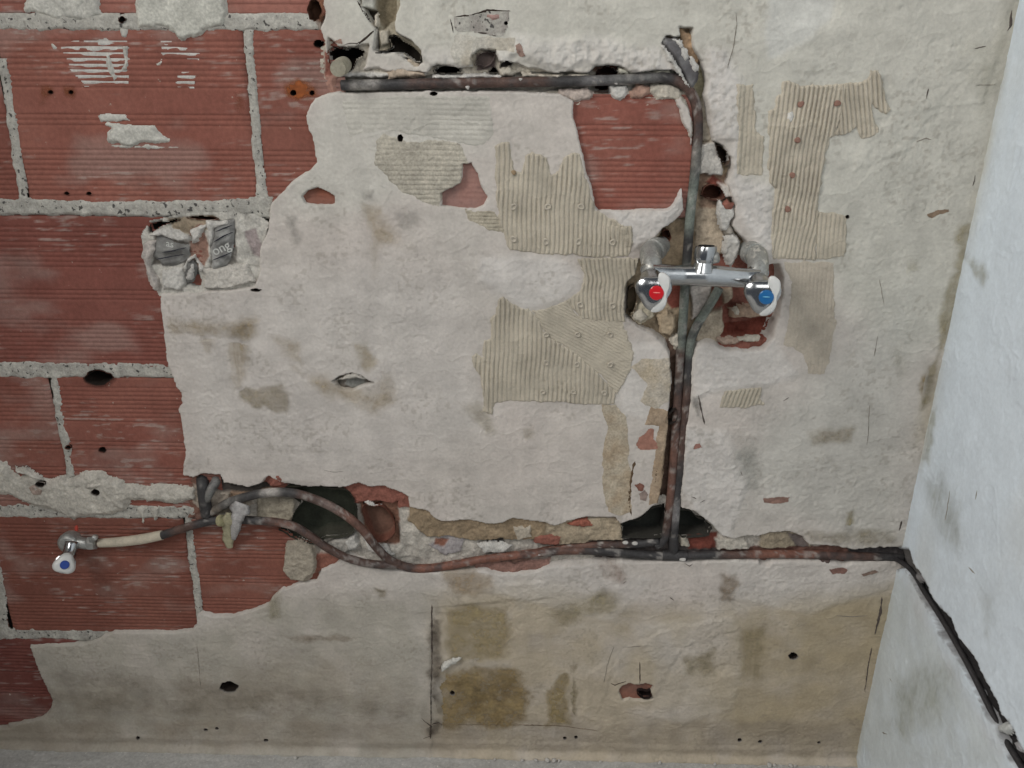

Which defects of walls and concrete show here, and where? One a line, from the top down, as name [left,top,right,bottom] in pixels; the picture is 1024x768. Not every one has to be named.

flaking render [0,0,346,490]
flaking render [442,163,487,208]
flaking render [558,83,693,218]
spalling [567,516,592,527]
flaking render [0,494,319,725]